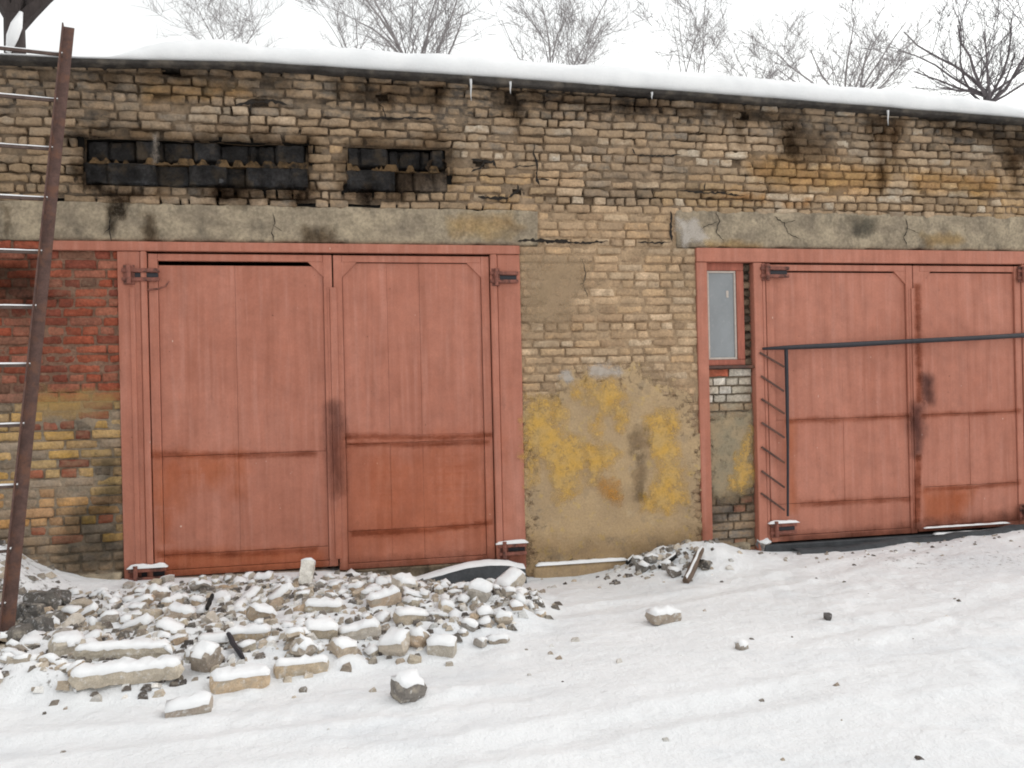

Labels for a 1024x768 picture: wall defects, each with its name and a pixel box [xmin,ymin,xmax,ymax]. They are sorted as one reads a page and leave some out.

crack [638,182,743,244]